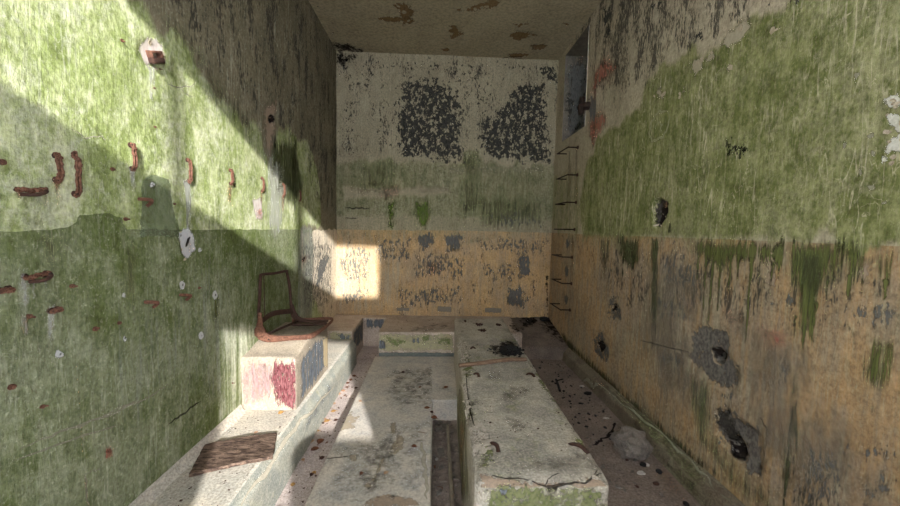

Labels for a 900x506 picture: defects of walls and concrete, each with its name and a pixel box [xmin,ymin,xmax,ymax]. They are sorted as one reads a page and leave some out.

water stain [332,32,597,230]
hole [653,199,669,227]
spalling [592,332,609,363]
spalling [687,324,762,476]
water stain [668,224,894,349]
crack [484,471,604,492]